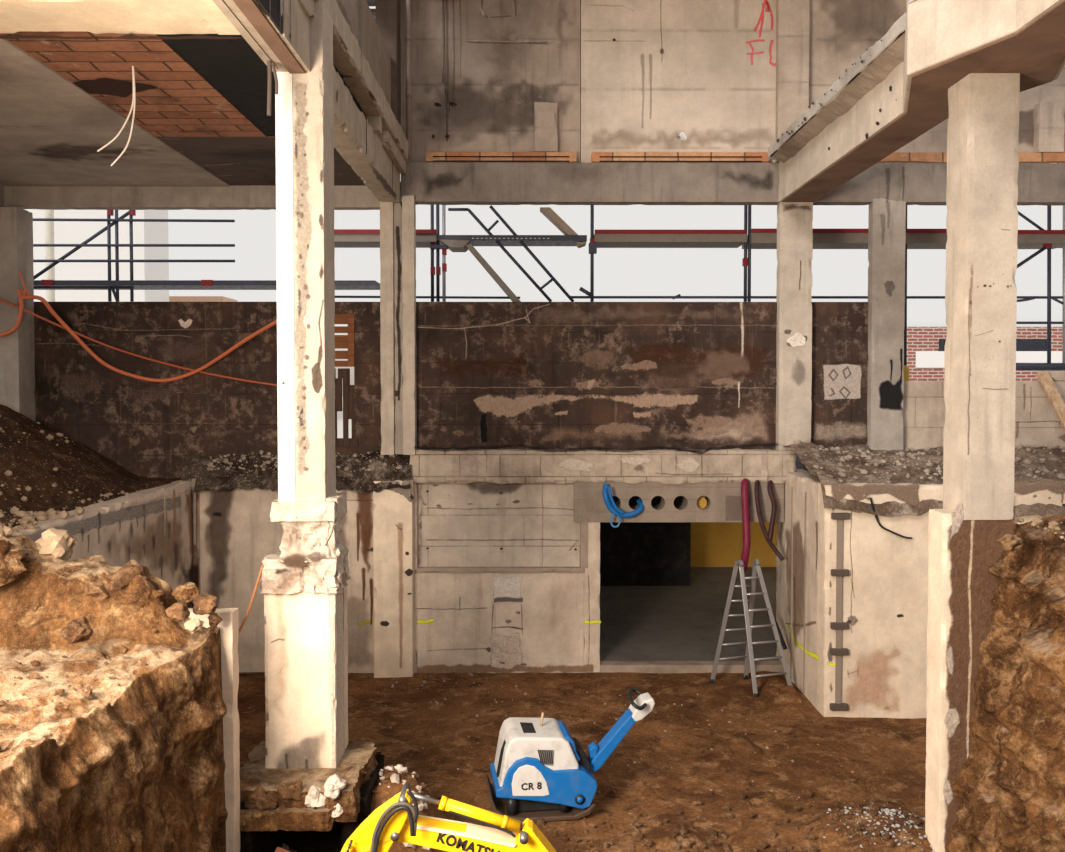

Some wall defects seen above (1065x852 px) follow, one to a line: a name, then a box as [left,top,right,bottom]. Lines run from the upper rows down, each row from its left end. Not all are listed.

spalling [294,84,323,473]
peeling [474,377,741,435]
peeling [621,360,657,371]
spalling [260,492,351,765]